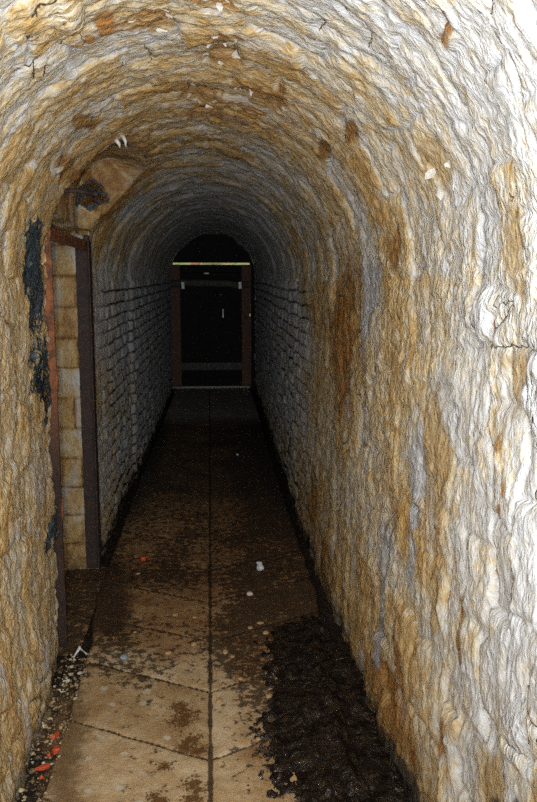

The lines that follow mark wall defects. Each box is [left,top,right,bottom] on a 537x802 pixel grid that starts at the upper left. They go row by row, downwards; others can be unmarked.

leakage [361,264,379,357]
leakage [406,391,449,585]
leakage [430,574,439,634]